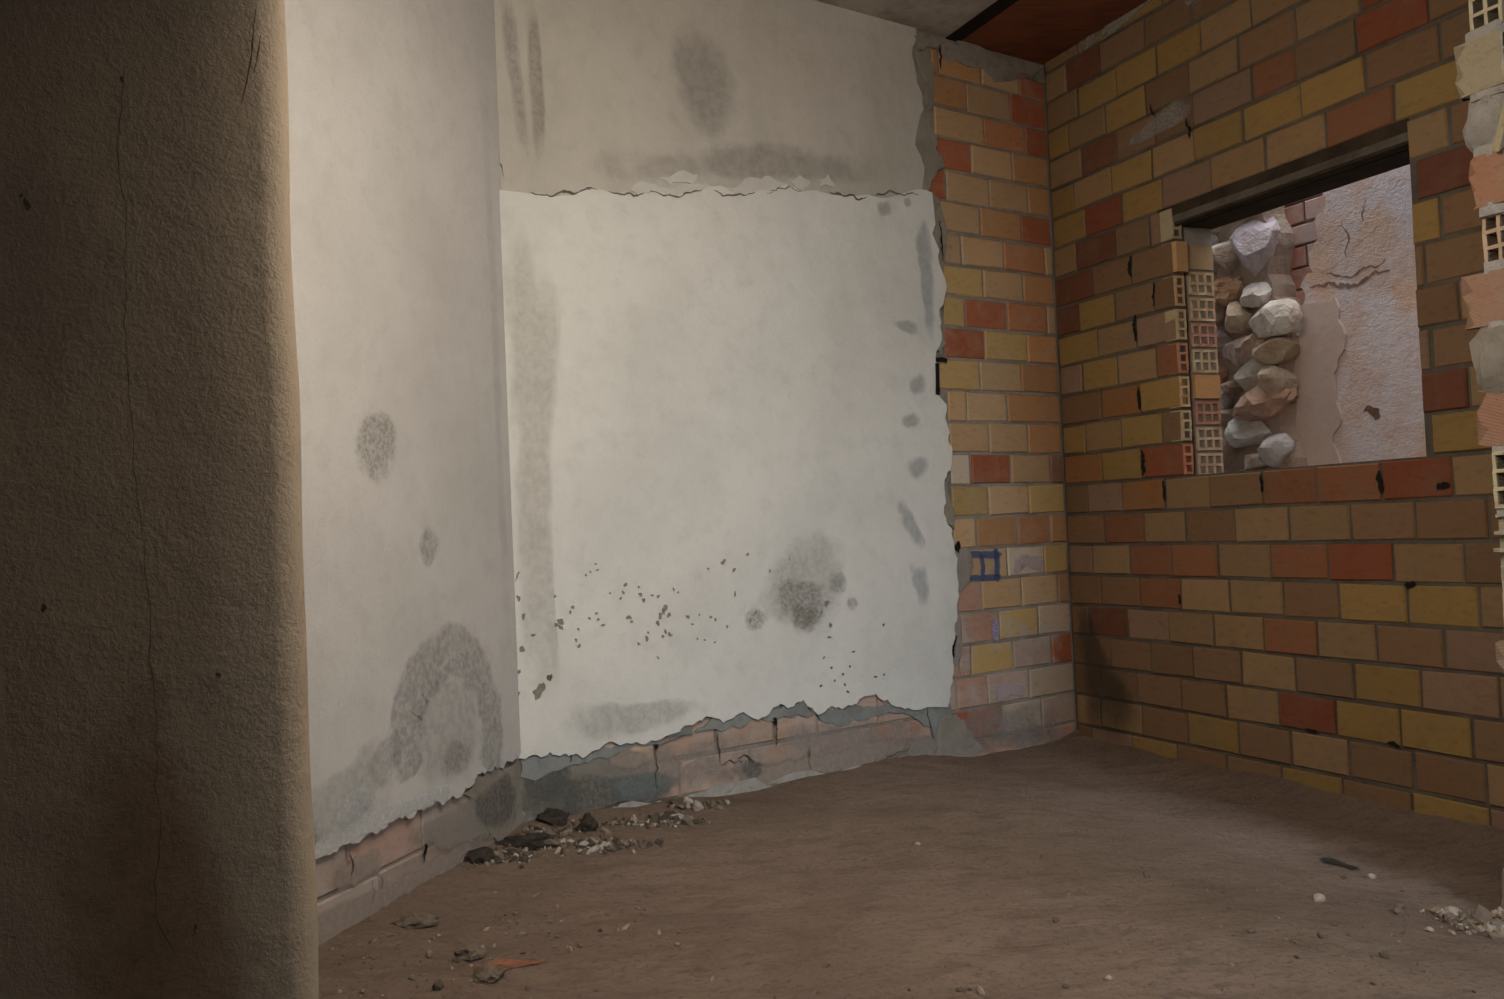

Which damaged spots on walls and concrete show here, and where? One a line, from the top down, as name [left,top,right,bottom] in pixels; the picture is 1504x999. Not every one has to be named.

flaking render [619,170,835,195]
flaking render [914,35,1046,274]
flaking render [937,304,946,356]
crack [117,67,174,953]
flaking render [944,474,973,664]
flaking render [318,651,1052,946]